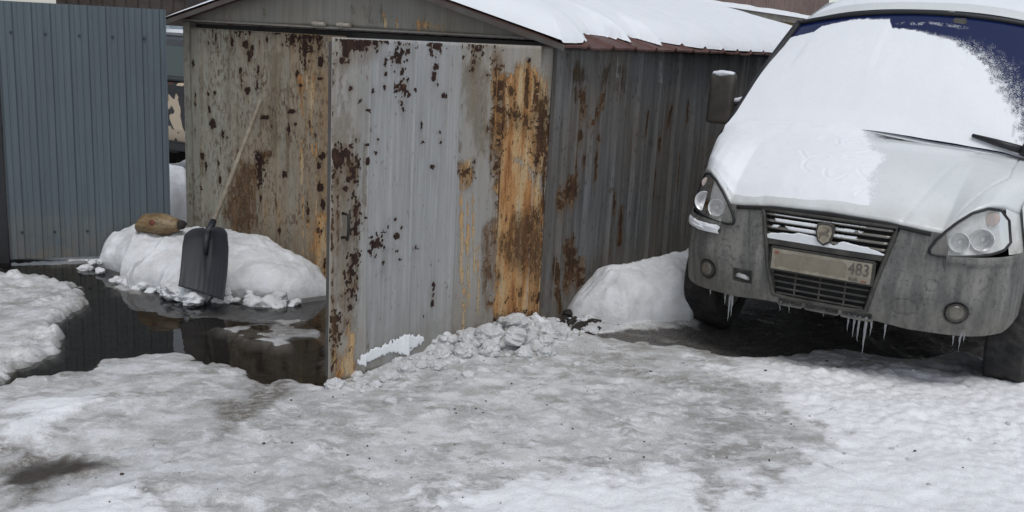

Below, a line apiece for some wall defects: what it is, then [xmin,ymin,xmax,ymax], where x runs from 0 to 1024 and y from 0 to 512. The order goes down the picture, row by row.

rust [194,91,228,139]
rust [200,20,447,379]
rust [457,44,625,329]